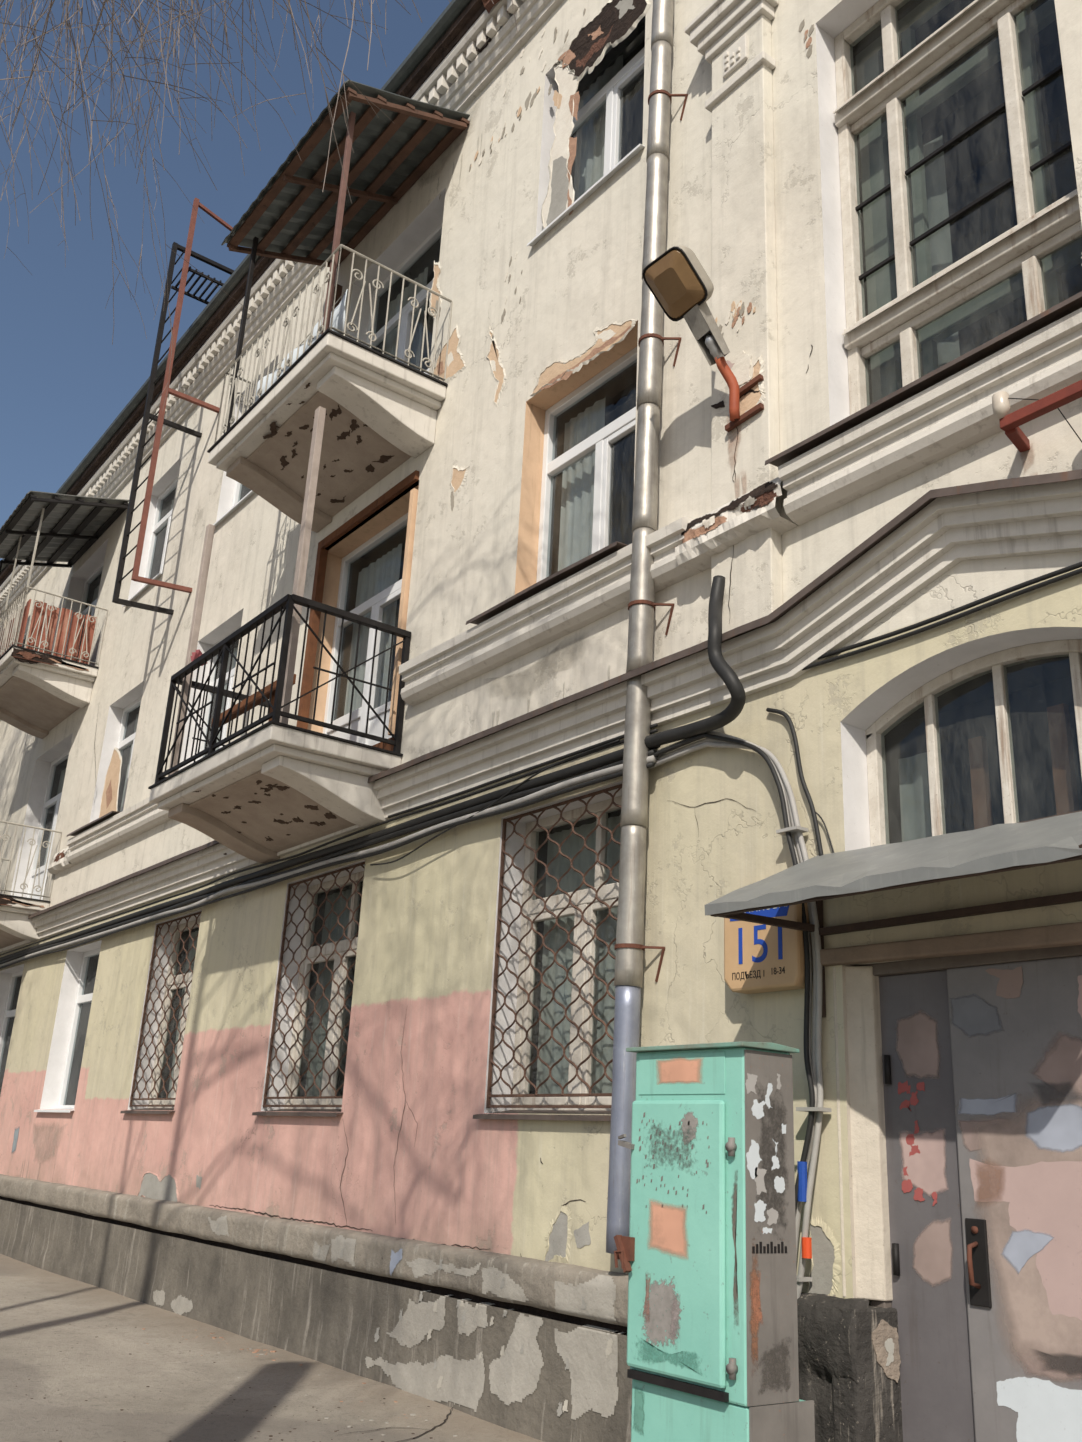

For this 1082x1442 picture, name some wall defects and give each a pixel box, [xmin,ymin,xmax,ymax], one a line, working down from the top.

peeling [429,260,443,322]
peeling [431,324,466,383]
peeling [486,252,522,407]
spalling [530,318,636,396]
spalling [681,481,778,536]
spalling [153,1290,193,1315]
spalling [365,1258,626,1420]
crack [339,1407,453,1442]